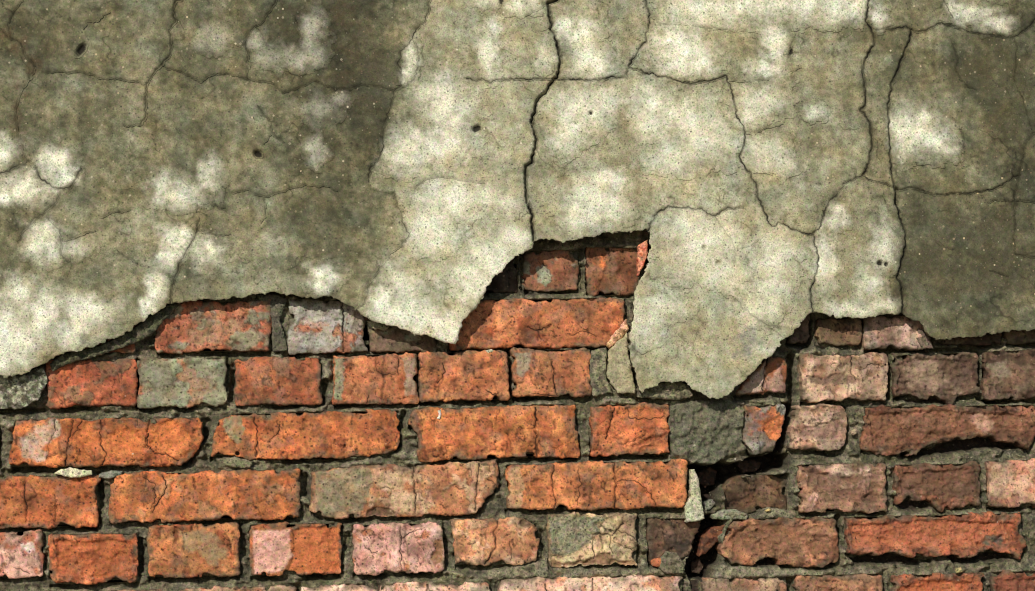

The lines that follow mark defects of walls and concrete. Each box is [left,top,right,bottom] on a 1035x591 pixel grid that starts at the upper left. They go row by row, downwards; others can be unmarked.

crack [0,0,431,262]
crack [466,0,1035,329]
spalling [0,302,181,410]
spalling [72,418,195,459]
crack [169,169,338,304]
spalling [287,523,341,574]
crack [341,176,485,352]
crack [527,326,596,337]
spalling [589,289,709,400]
crack [684,358,795,591]
spalling [848,499,1017,566]
spalling [866,313,1031,460]